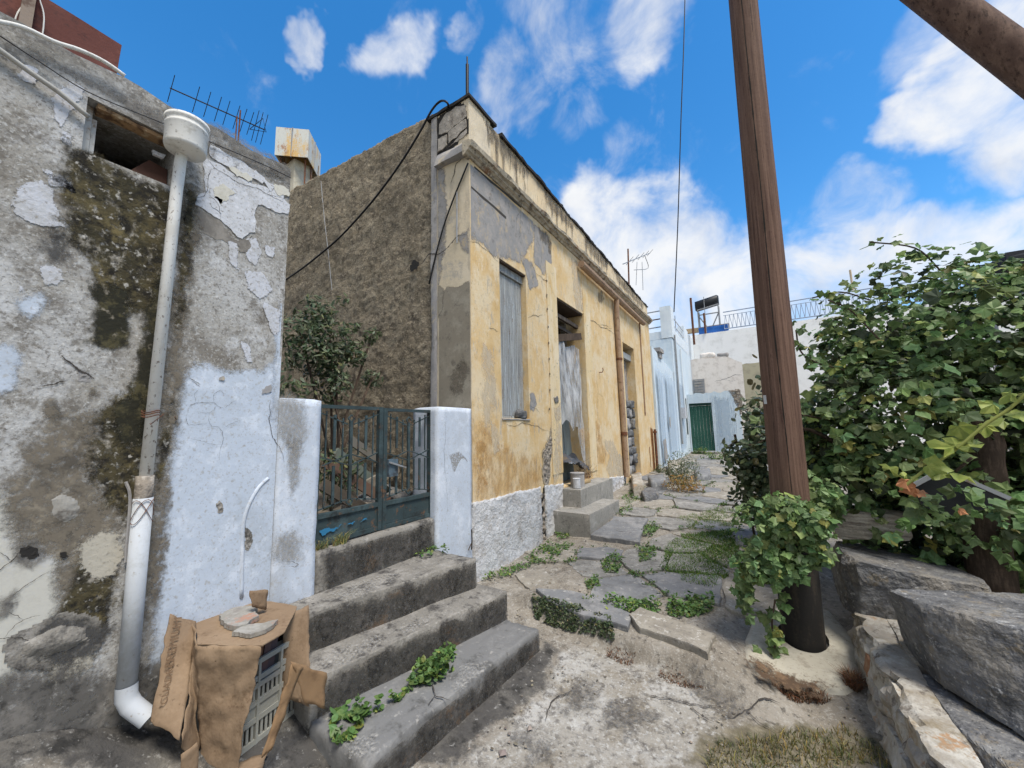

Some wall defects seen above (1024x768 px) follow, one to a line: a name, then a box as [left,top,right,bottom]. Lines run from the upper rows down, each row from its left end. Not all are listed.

peeling [11,169,76,228]
leakage [39,228,70,260]
flaking render [458,164,552,290]
crack [186,378,237,455]
peeling [144,145,290,695]